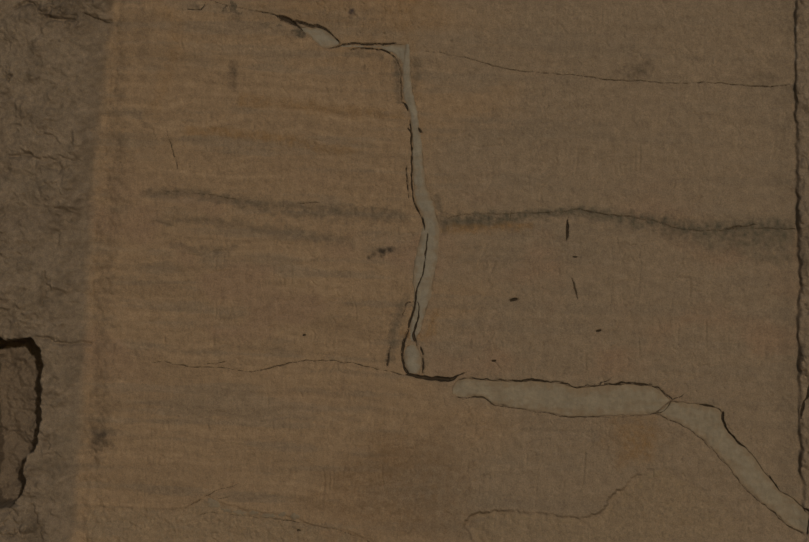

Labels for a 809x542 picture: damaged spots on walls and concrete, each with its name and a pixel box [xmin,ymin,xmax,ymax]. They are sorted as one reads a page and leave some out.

crack [153,10,802,533]
crack [800,386,809,419]